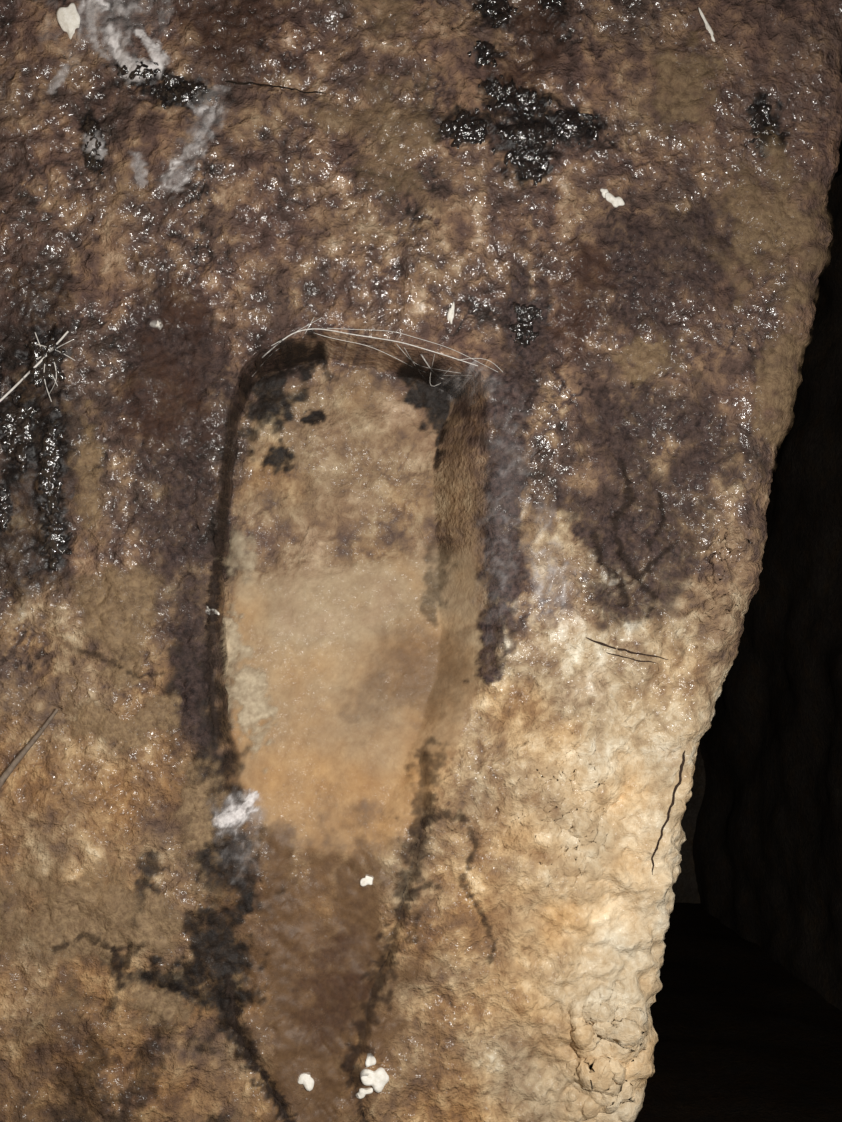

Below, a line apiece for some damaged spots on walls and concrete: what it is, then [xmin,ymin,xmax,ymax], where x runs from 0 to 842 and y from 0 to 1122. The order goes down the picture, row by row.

water stain [81,0,125,13]
water stain [106,24,168,81]
water stain [538,0,567,23]
water stain [162,142,202,190]
water stain [0,475,38,555]
water stain [25,393,68,518]
water stain [433,378,455,469]
water stain [476,265,552,684]
water stain [554,386,746,627]
water stain [103,288,417,1122]